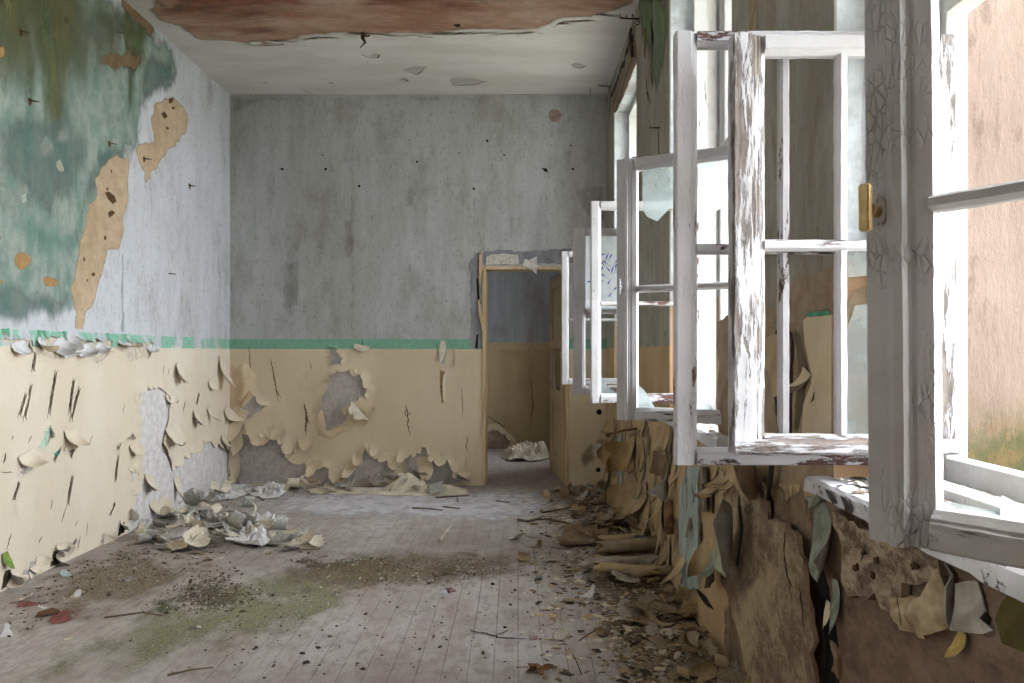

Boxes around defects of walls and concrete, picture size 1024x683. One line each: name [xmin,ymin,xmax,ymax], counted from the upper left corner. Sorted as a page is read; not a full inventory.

peeling [243,24,498,46]
leakage [0,0,667,319]
crack [3,352,121,557]
peeling [0,97,472,545]
peeling [716,315,728,436]
flaking render [764,266,834,433]
flaking render [596,419,1024,683]